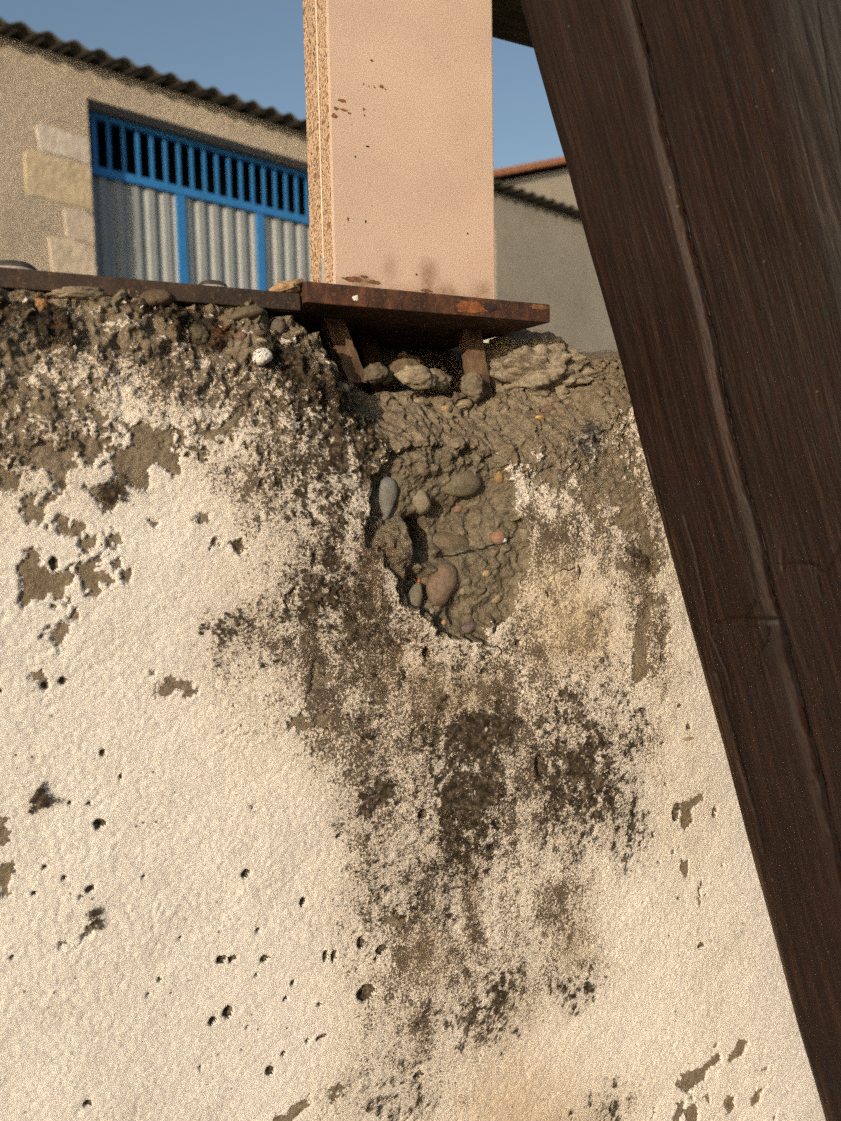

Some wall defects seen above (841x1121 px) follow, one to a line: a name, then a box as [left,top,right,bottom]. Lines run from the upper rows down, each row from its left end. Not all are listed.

rust [341,275,380,284]
rust [456,300,498,313]
leakage [0,292,87,362]
leakage [91,472,148,510]
peeling [0,420,181,647]
spalling [364,444,529,642]
peeling [151,671,199,699]
leakage [188,328,664,1121]
peeling [672,793,717,831]
peeling [0,861,16,897]
peeling [672,1039,748,1121]
peeling [273,1093,311,1121]